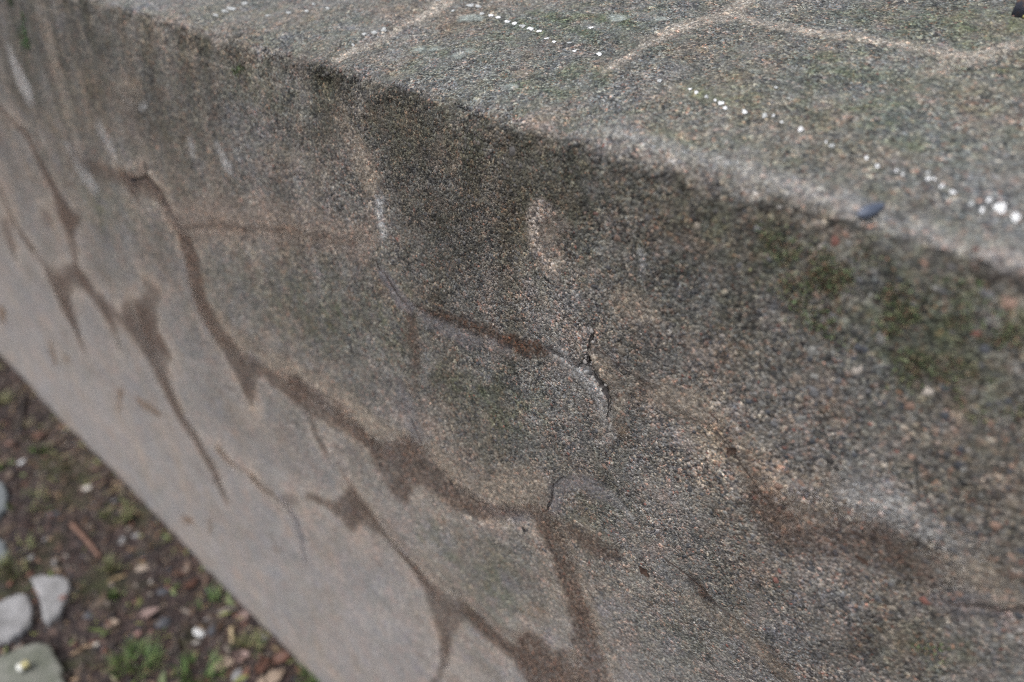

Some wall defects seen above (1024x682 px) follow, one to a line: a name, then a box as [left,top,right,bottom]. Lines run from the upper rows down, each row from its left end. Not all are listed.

damp [0,107,224,497]
damp [317,116,387,261]
damp [149,178,617,682]
crack [545,328,781,516]